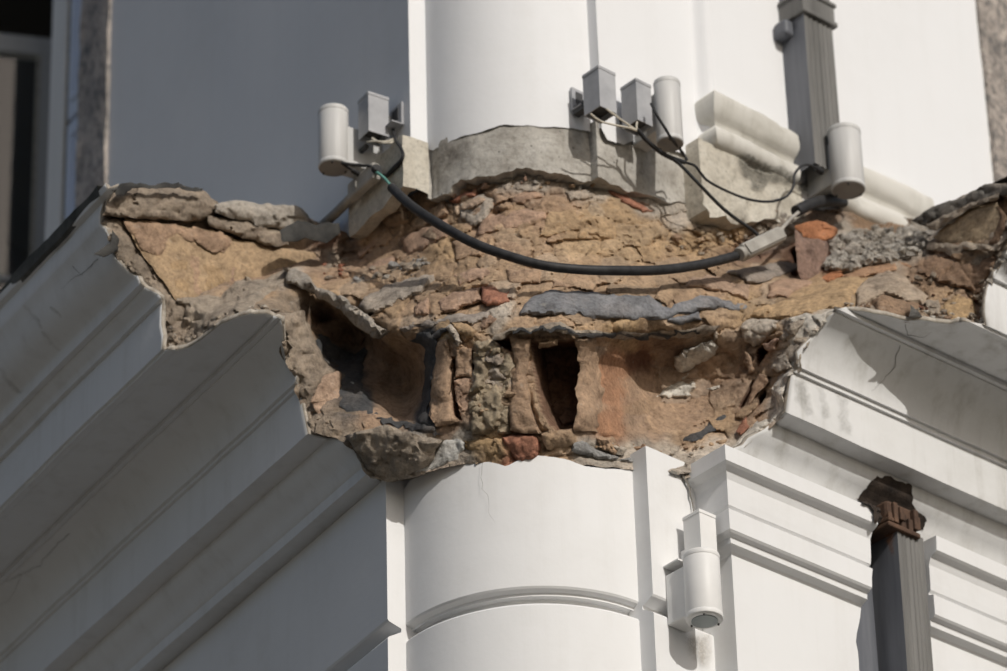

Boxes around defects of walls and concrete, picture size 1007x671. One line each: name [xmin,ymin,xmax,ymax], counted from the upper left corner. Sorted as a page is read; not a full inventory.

spalling [94,121,1007,482]